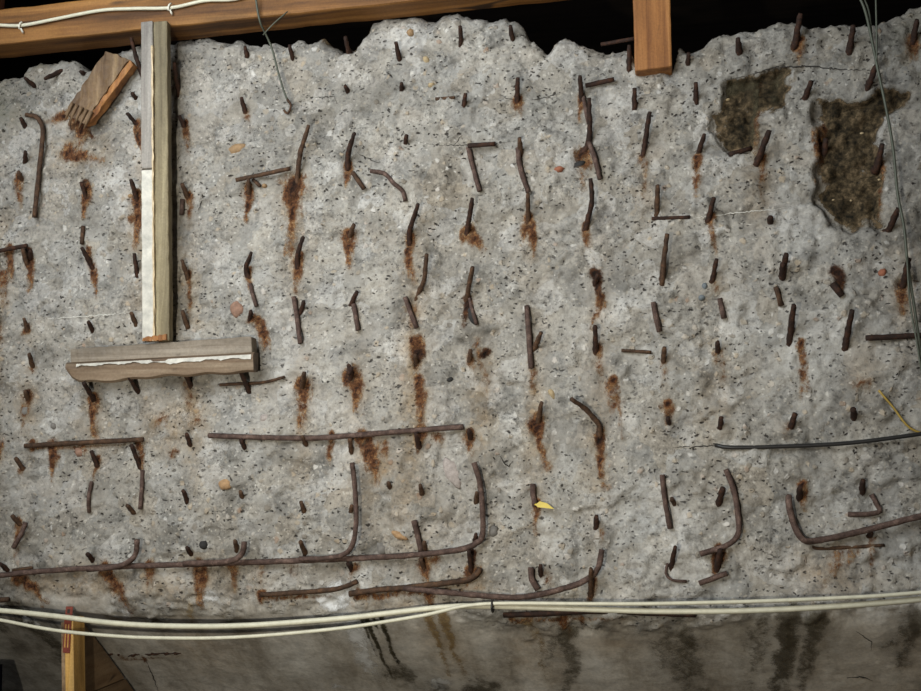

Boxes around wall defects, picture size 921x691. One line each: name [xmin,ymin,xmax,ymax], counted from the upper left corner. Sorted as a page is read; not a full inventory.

spalling [578,75,615,232]
spalling [696,68,792,167]
spalling [802,65,910,233]
corrosion [128,188,142,249]
corrosion [279,173,307,293]
corrosion [341,364,365,413]
corrosion [409,305,444,453]
spalling [0,424,605,601]
damp [462,678,500,691]
damp [549,627,581,691]
damp [651,628,704,689]
damp [747,602,830,691]